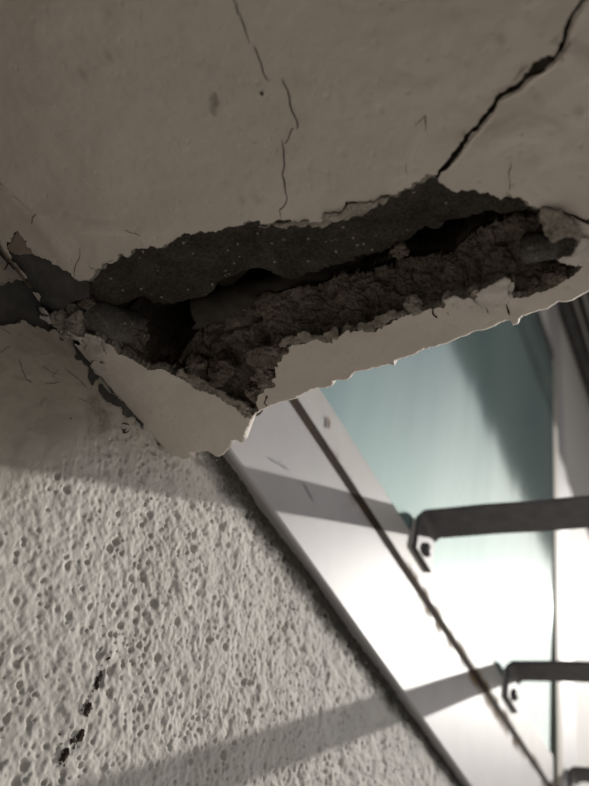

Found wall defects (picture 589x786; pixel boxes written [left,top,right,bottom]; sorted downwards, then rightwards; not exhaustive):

crack [233,0,298,218]
crack [432,0,589,176]
crack [0,249,15,270]
spalling [0,169,589,429]